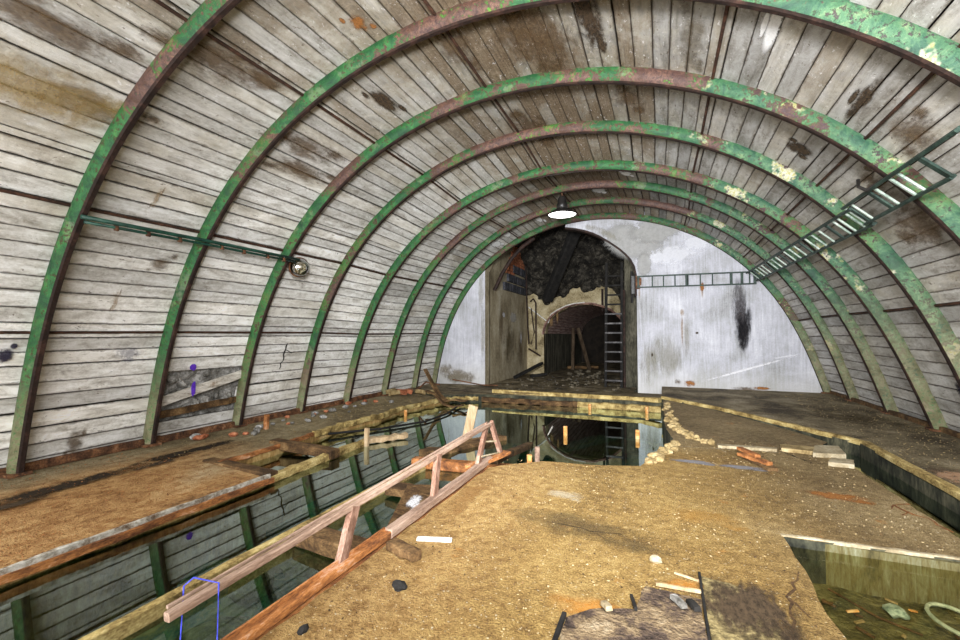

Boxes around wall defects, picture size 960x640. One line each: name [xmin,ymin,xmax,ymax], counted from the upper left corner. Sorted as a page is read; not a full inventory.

rust [339,16,376,30]
water stain [574,0,607,53]
water stain [361,91,407,112]
water stain [847,80,879,118]
water stain [786,138,811,160]
water stain [735,285,749,349]